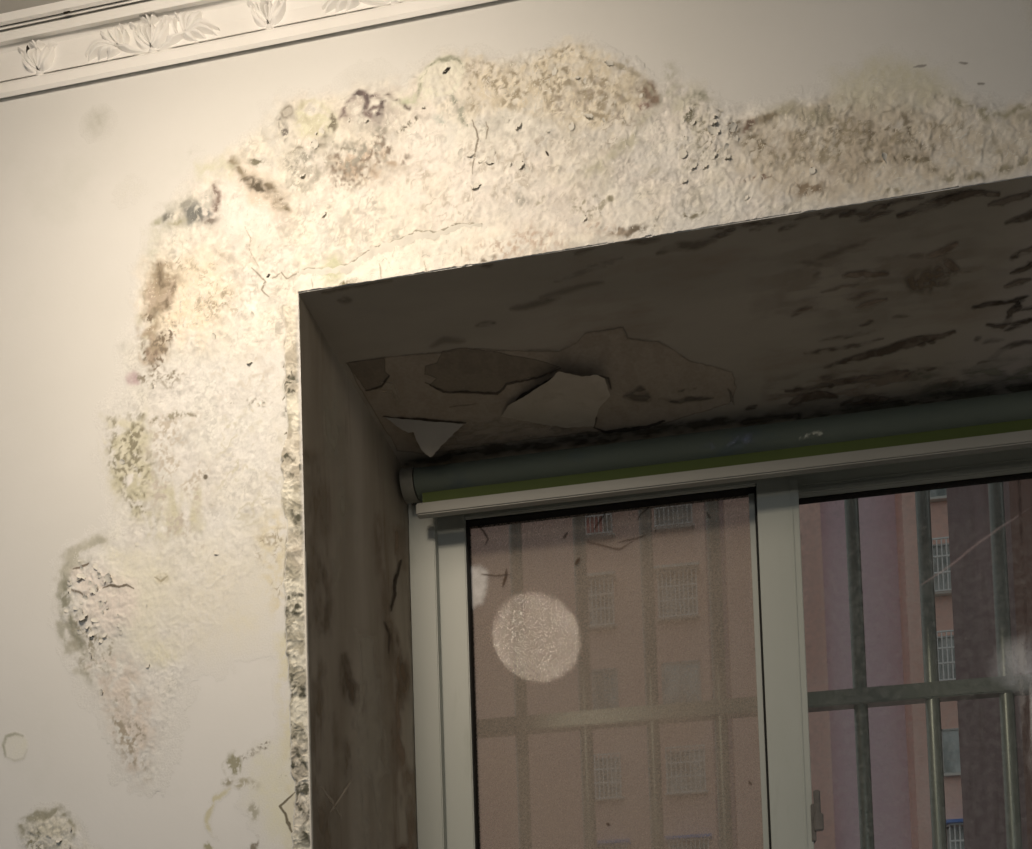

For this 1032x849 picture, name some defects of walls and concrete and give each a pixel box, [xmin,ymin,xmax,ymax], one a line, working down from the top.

leakage [110,32,1032,395]
peeling [347,327,736,457]
leakage [413,331,1032,463]
leakage [49,401,219,797]
spalling [245,220,524,849]
leakage [13,800,104,849]
leakage [202,732,291,849]